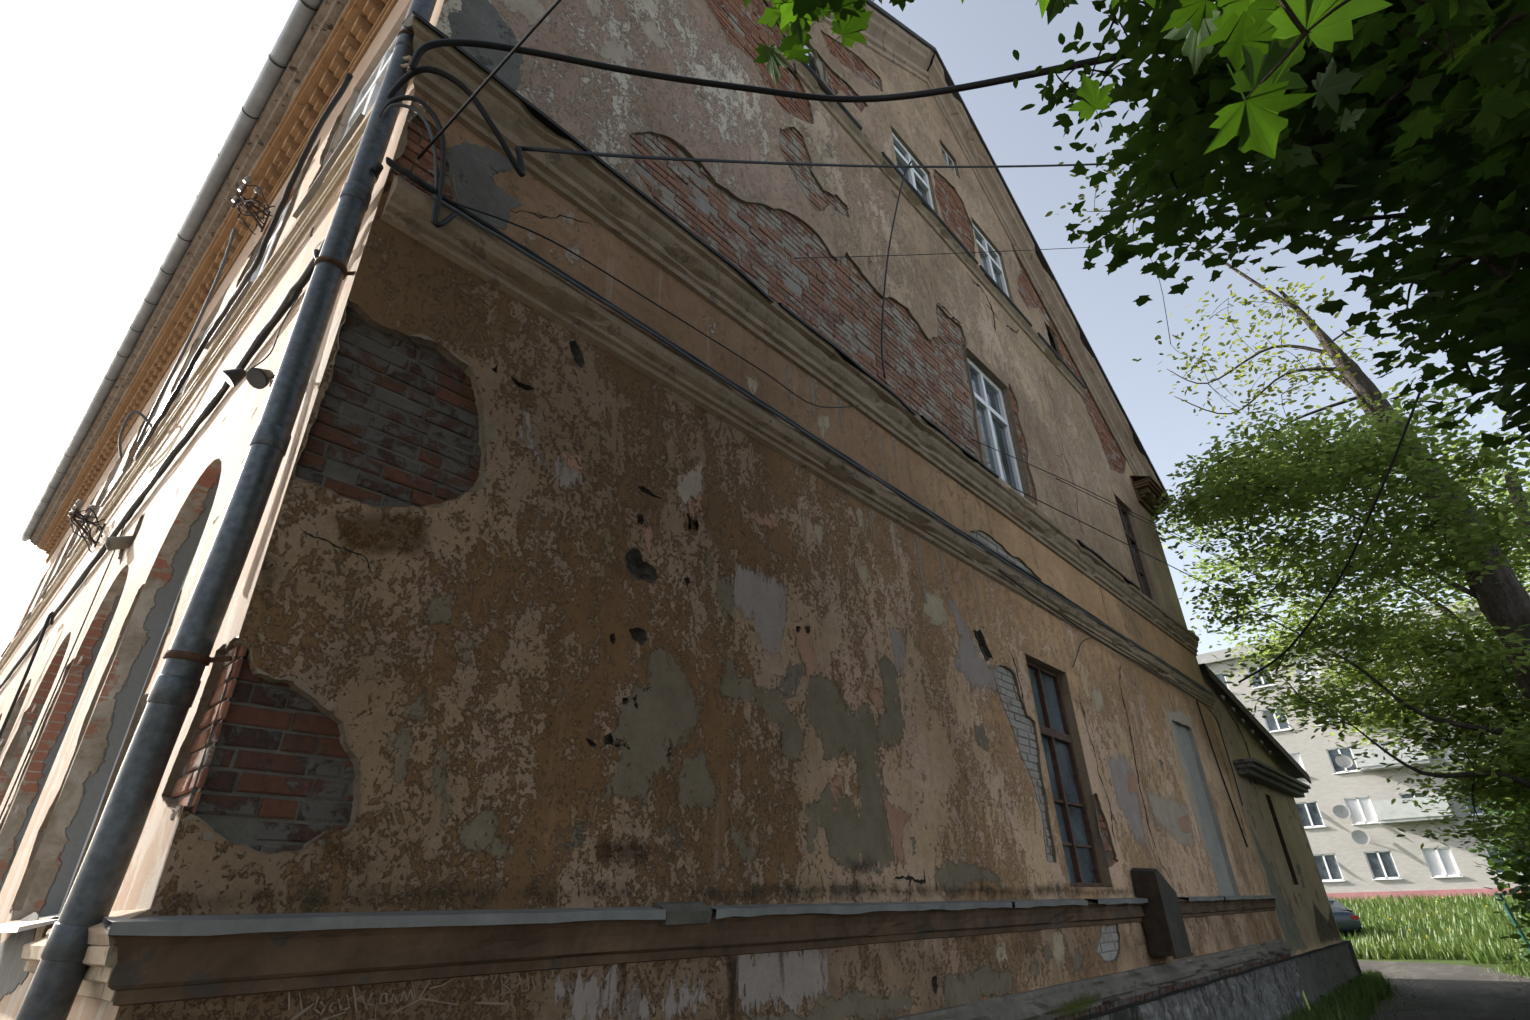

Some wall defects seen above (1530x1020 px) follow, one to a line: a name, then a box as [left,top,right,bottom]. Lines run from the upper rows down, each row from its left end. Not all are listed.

peeling [447,0,552,90]
flaking render [629,0,984,463]
flaking render [293,299,586,514]
flaking render [0,584,182,1001]
flaking render [161,636,361,855]
spalling [585,733,630,749]
spalling [610,627,647,645]
peeling [657,744,718,811]
peeling [726,563,811,658]
peeling [804,654,912,877]
peeling [922,586,949,626]
flaking render [973,630,1057,863]